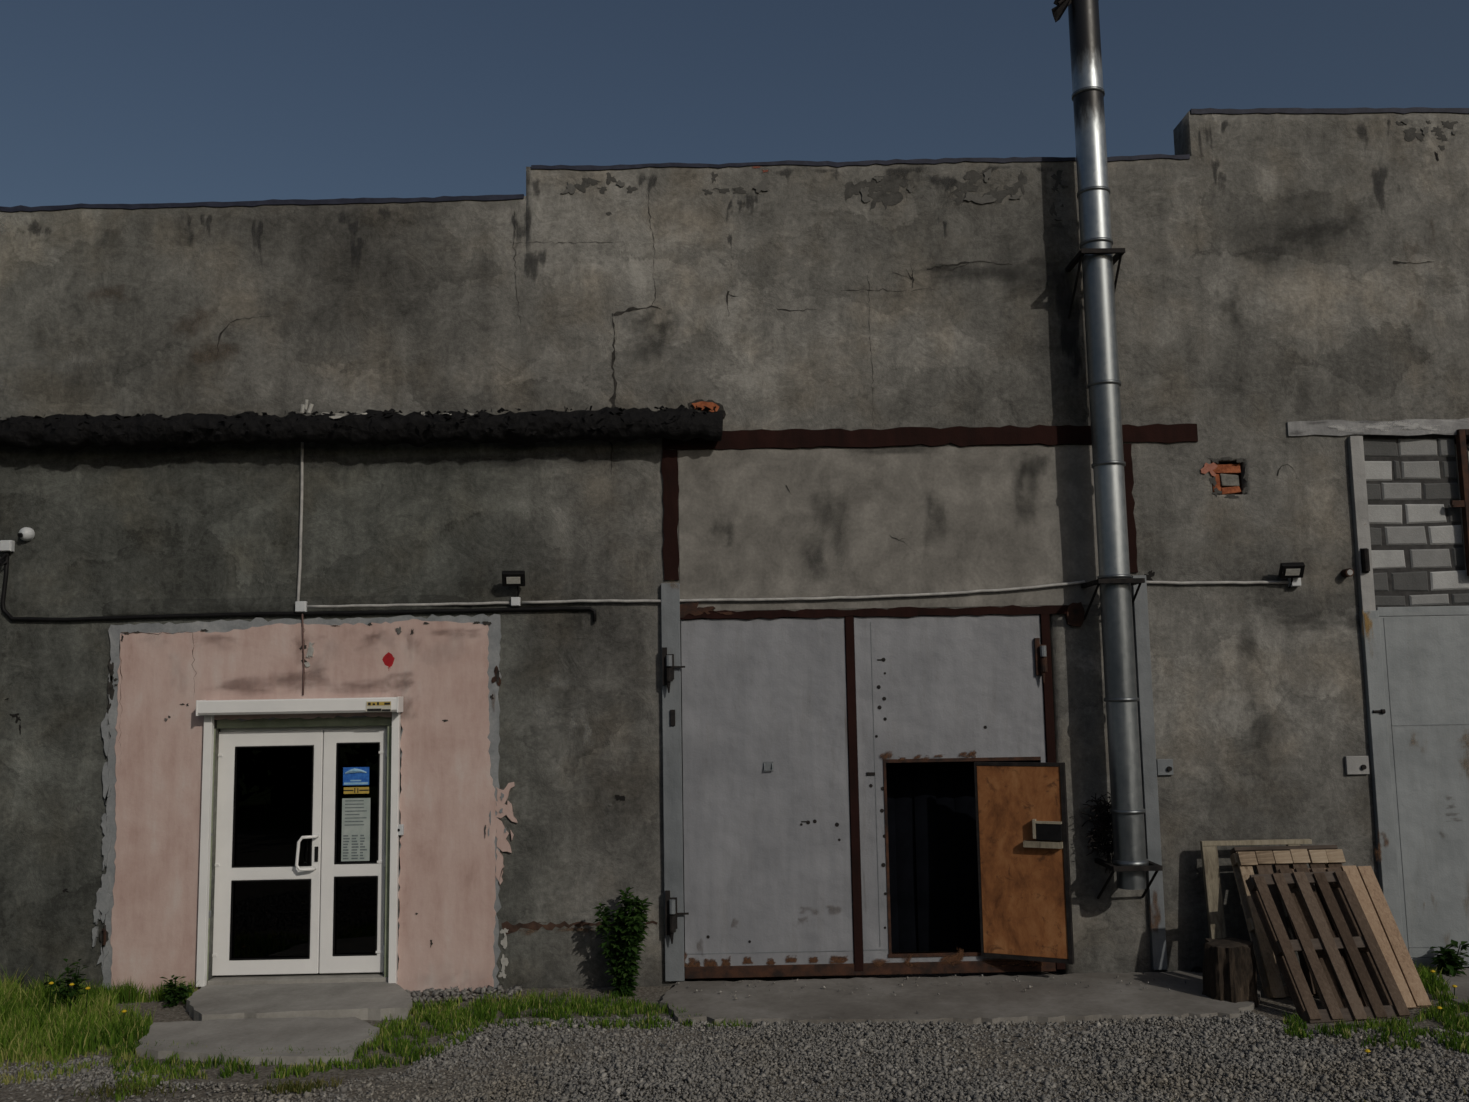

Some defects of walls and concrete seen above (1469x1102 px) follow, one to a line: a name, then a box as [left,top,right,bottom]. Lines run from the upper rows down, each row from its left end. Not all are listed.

spalling [845,172,915,210]
spalling [951,168,1027,205]
damp [1374,171,1386,200]
crack [511,194,660,470]
peeling [485,782,518,885]
corrosion [684,953,848,968]